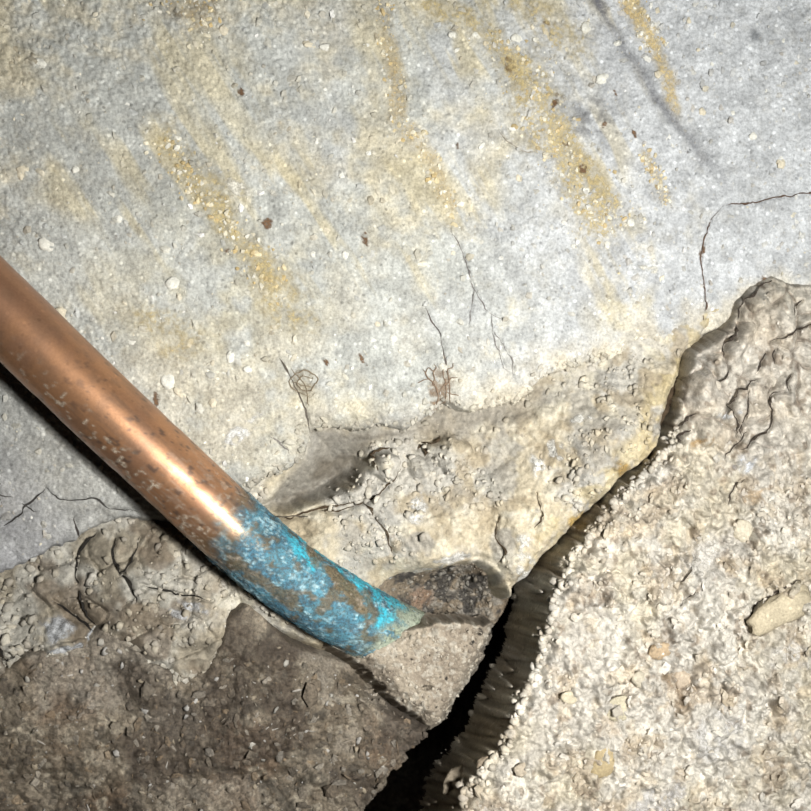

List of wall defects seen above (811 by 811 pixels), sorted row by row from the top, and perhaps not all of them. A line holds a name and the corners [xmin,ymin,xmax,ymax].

crack [700,192,811,320]
crack [425,307,447,372]
crack [719,280,811,456]
crack [660,374,695,442]
crack [418,439,441,456]
damp [410,498,426,524]
crack [0,488,211,632]
damp [424,552,470,570]